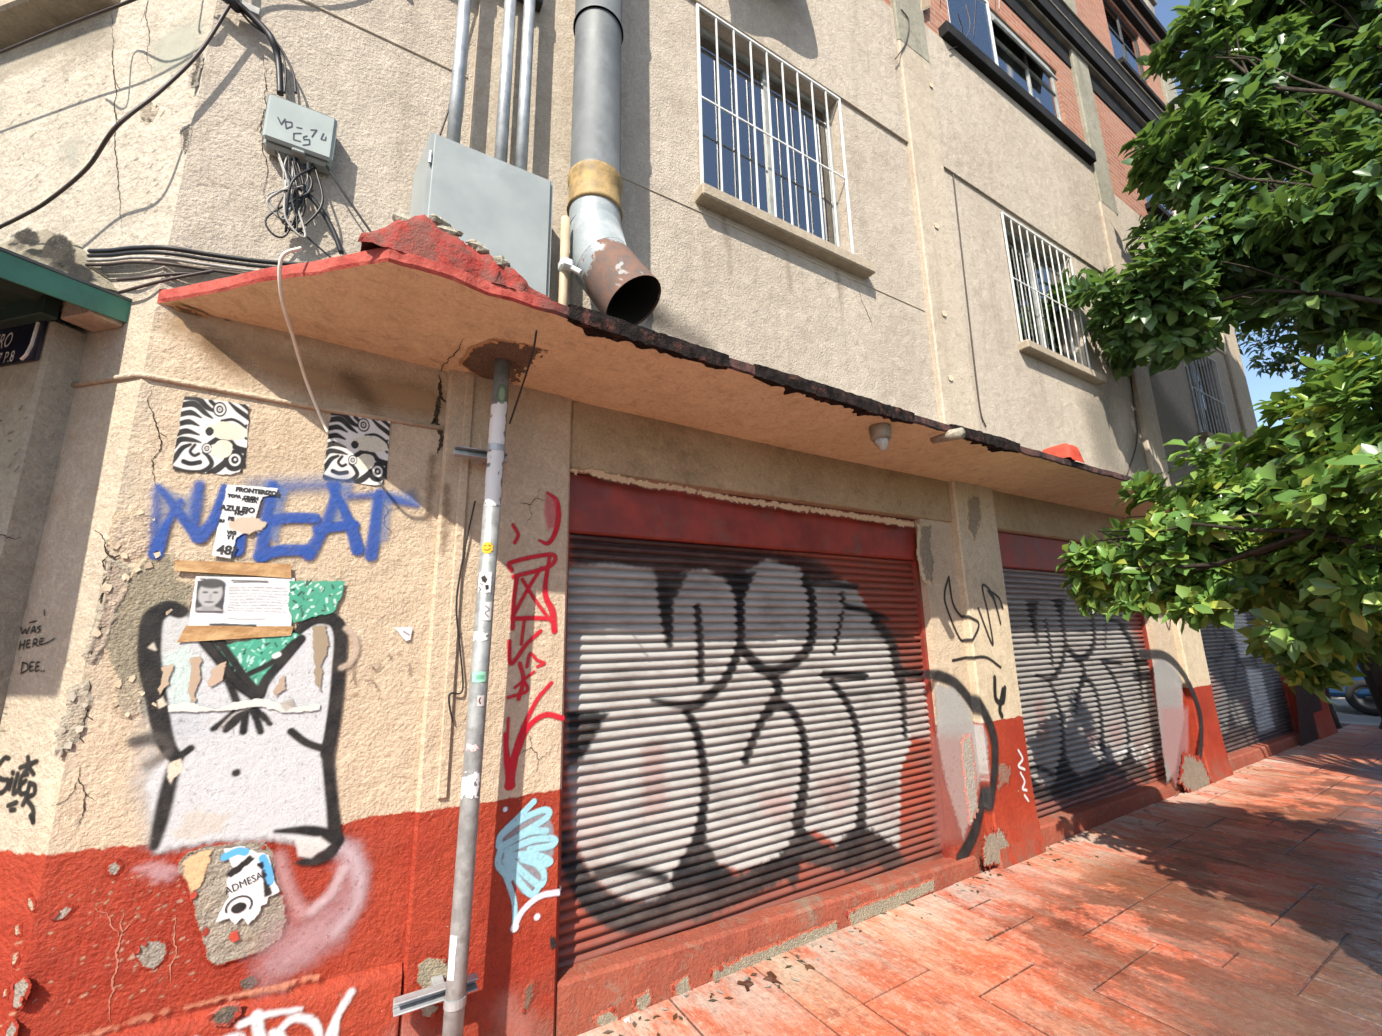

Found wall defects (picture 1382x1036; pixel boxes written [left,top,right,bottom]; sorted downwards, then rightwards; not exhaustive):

crack [111,2,150,224]
spalling [429,214,513,269]
peeling [54,507,195,759]
spalling [709,876,935,981]
spalling [2,892,78,1036]
spalling [418,1003,441,1019]
spalling [414,955,448,990]
spalling [592,986,654,1028]
spalling [670,973,694,997]